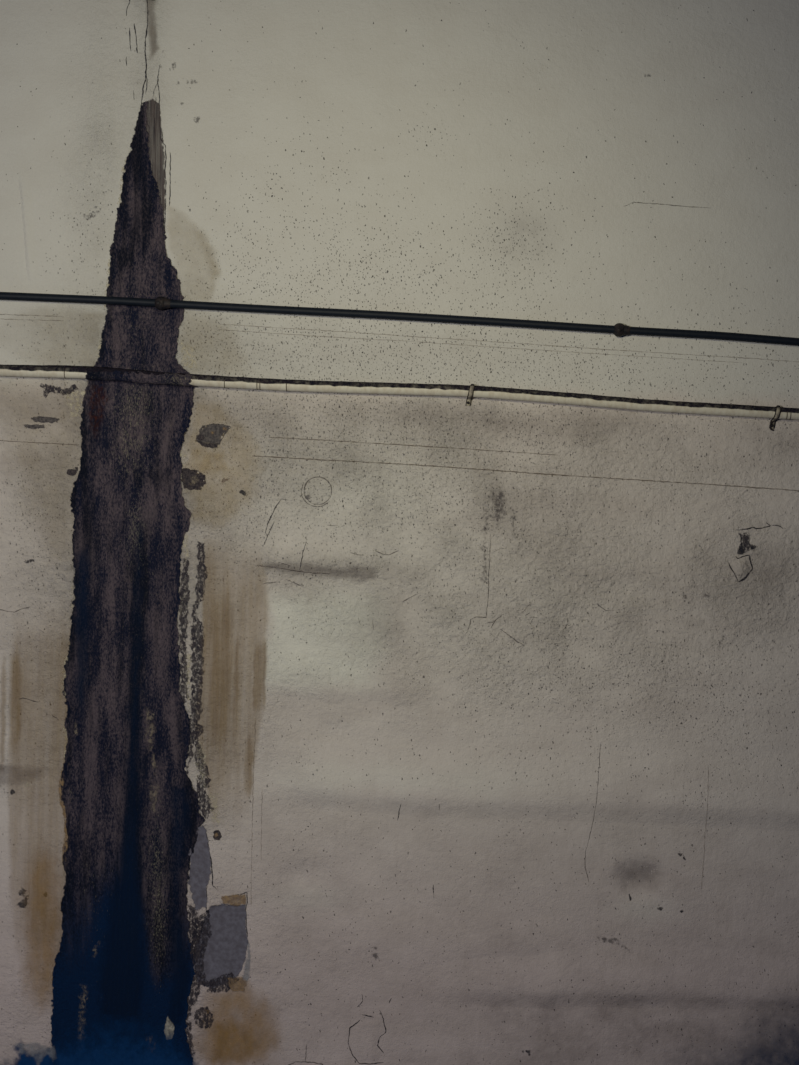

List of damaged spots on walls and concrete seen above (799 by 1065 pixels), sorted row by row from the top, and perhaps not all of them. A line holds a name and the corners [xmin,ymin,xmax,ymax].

crack [126,0,160,108]
crack [162,134,171,228]
damp [15,99,212,1065]
spalling [188,796,248,993]
spalling [194,1007,213,1028]